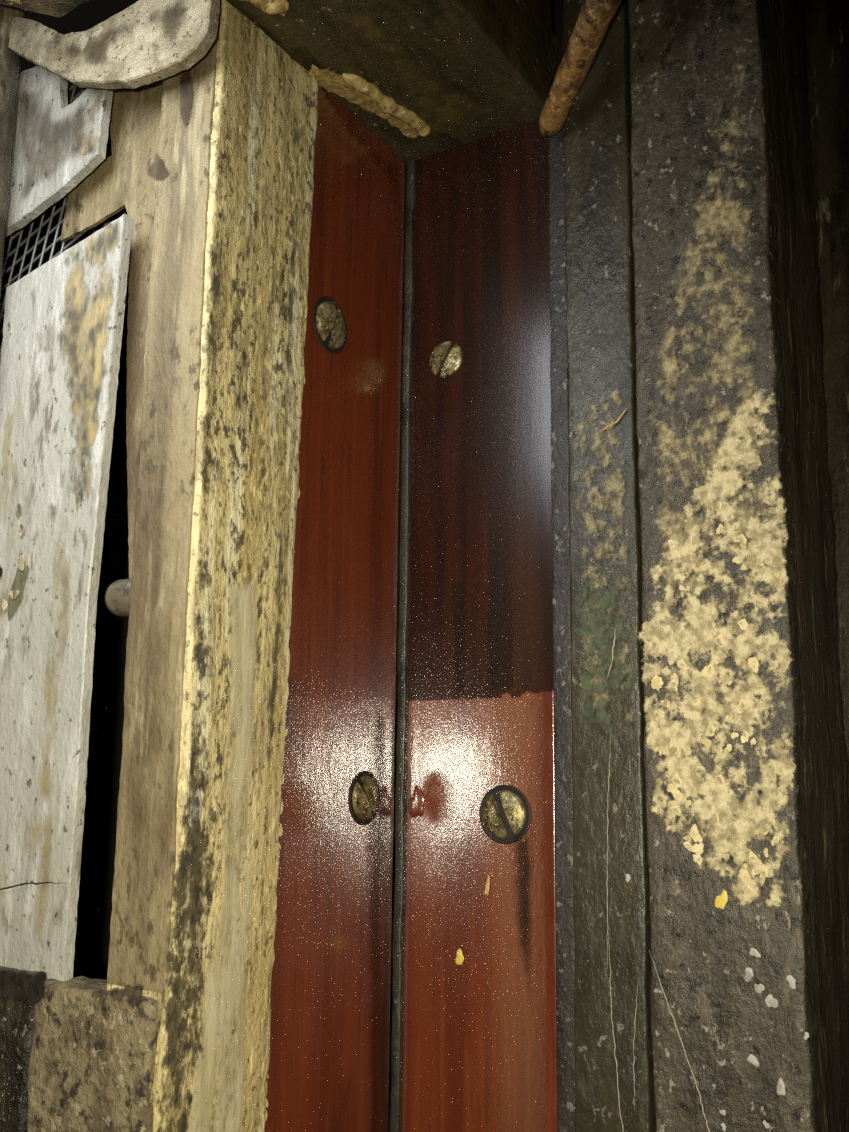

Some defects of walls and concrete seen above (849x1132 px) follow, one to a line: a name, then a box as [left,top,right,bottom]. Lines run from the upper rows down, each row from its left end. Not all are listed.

leakage [206,251,220,352]
leakage [286,247,296,391]
leakage [200,417,212,493]
leakage [198,560,211,590]
leakage [194,617,209,707]
leakage [267,533,283,760]
crack [0,882,67,890]
leakage [156,724,214,1132]